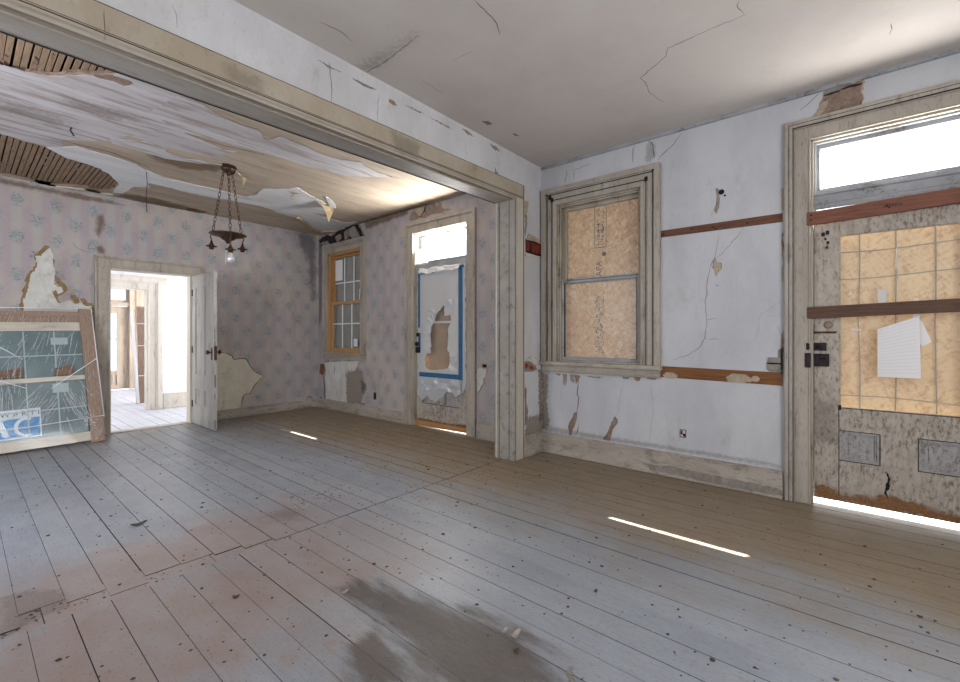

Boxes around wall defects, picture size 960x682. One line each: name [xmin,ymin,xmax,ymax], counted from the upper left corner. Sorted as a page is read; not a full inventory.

crack [640,1,744,103]
flaking render [813,80,865,117]
peeling [0,33,390,249]
flaking render [711,188,726,217]
crack [674,232,741,360]
peeling [568,412,577,435]
peeling [603,417,618,441]